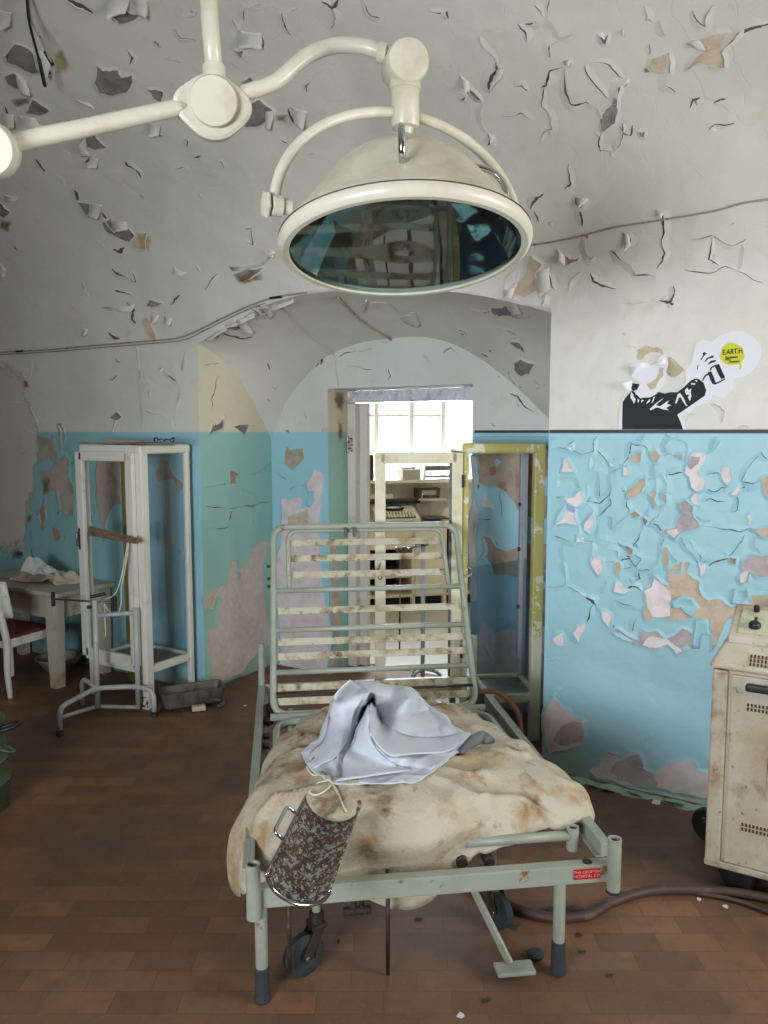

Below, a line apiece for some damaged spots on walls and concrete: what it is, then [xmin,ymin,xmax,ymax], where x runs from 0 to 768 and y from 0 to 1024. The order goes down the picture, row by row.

crack [645,6,664,37]
crack [689,6,715,32]
peeling [1,41,65,130]
peeling [91,64,166,102]
peeling [242,97,308,131]
crack [690,97,736,132]
crack [526,164,764,310]
peeling [470,249,582,319]
crack [108,346,219,429]
flaking render [0,364,76,552]
flaking render [201,445,341,684]
flaking render [468,443,768,811]